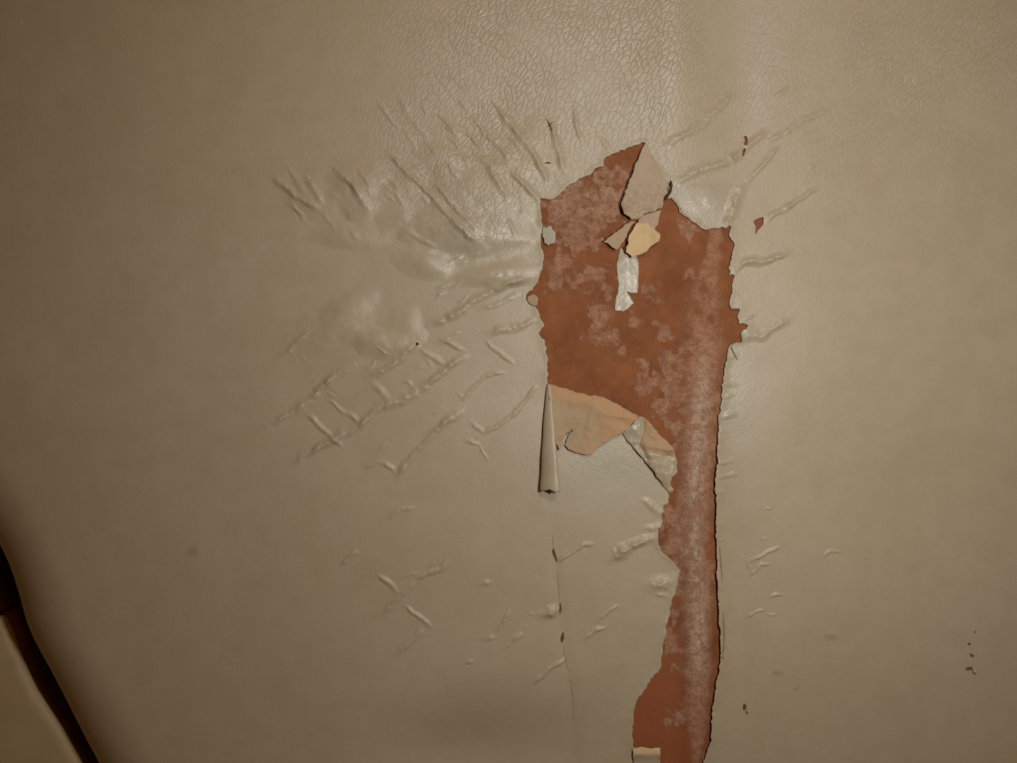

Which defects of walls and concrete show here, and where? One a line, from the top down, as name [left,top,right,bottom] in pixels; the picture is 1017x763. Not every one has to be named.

peeling [526,142,748,763]